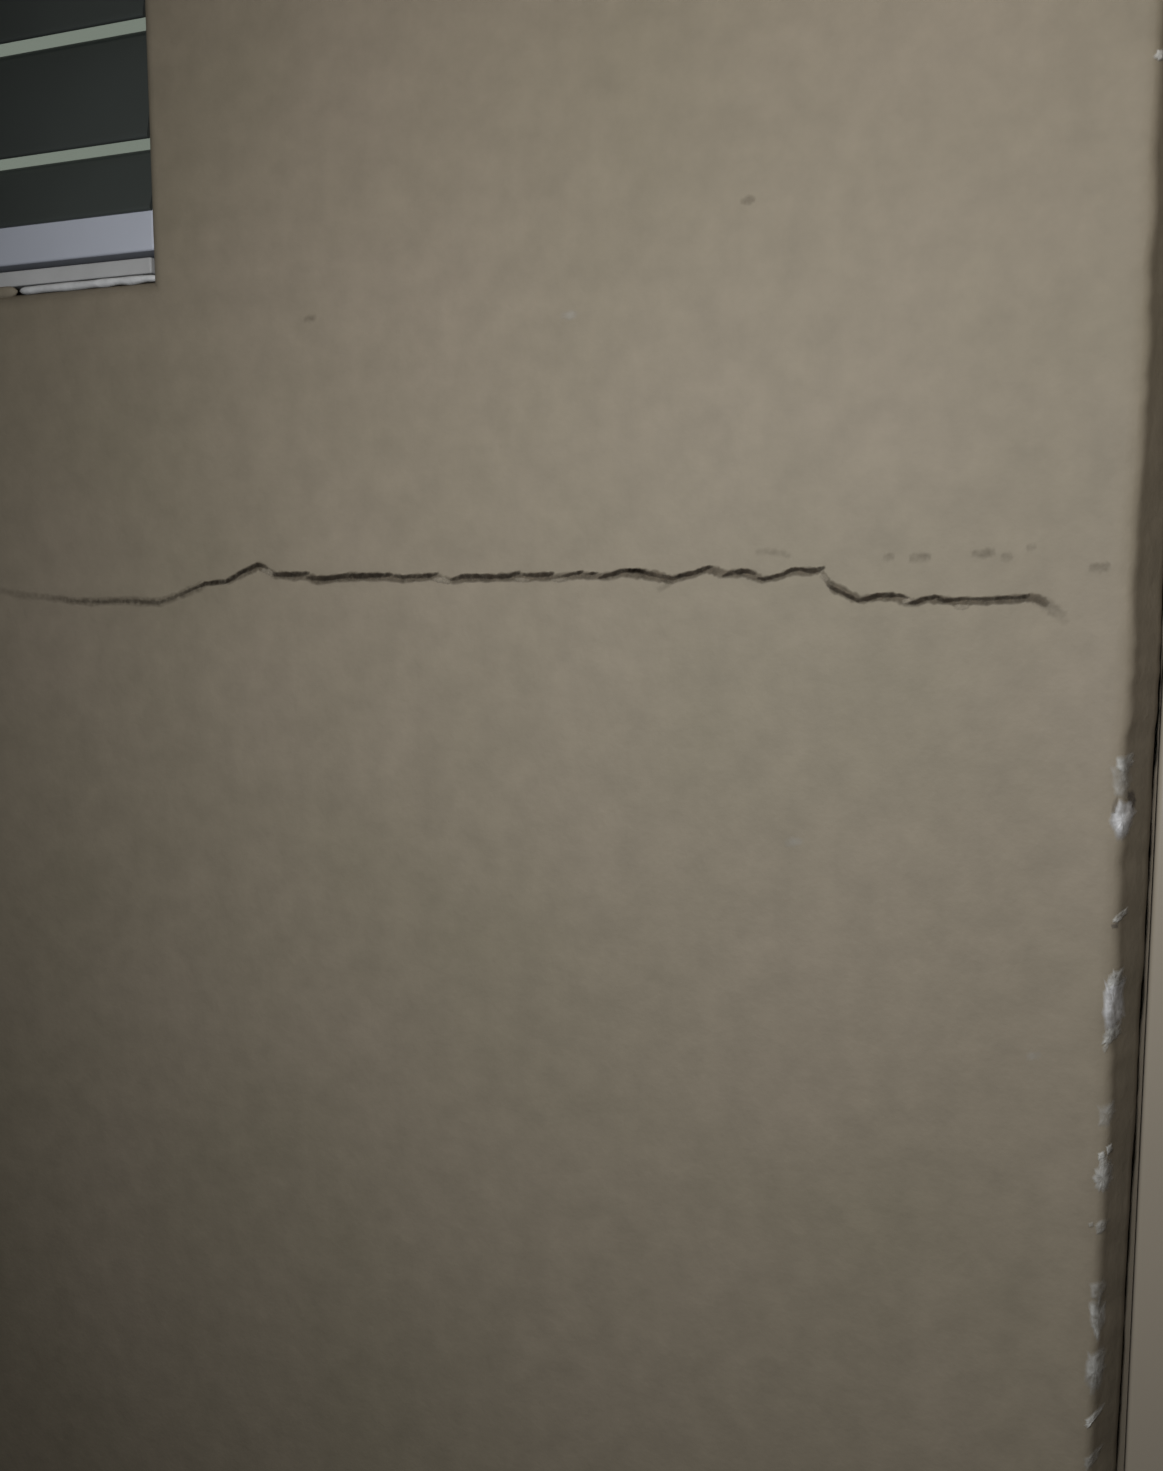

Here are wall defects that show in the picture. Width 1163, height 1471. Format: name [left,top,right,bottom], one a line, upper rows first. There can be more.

crack [97,563,1044,609]
peeling [1112,792,1135,835]
peeling [1103,970,1123,1044]
peeling [1094,1144,1113,1189]
peeling [1087,1304,1105,1387]